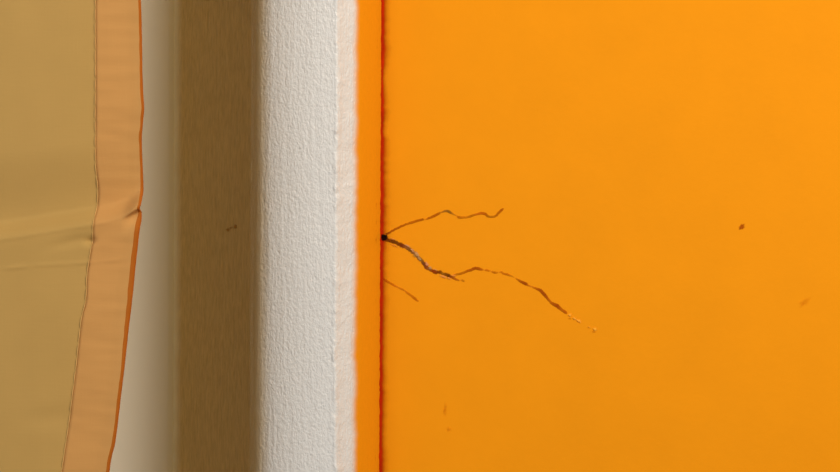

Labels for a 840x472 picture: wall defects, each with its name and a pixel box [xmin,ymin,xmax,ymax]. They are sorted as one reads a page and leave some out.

crack [379,0,596,472]